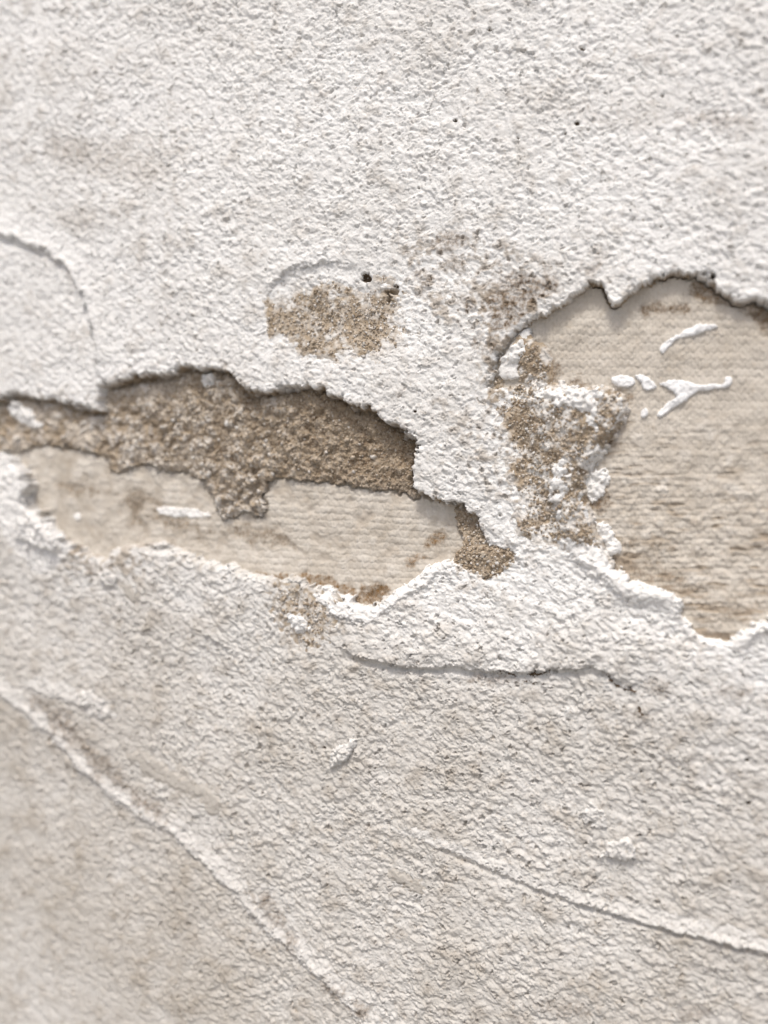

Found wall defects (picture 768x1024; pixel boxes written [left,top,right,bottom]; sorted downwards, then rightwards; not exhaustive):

spalling [0,205,768,656]
crack [500,670,551,688]
crack [606,674,663,720]